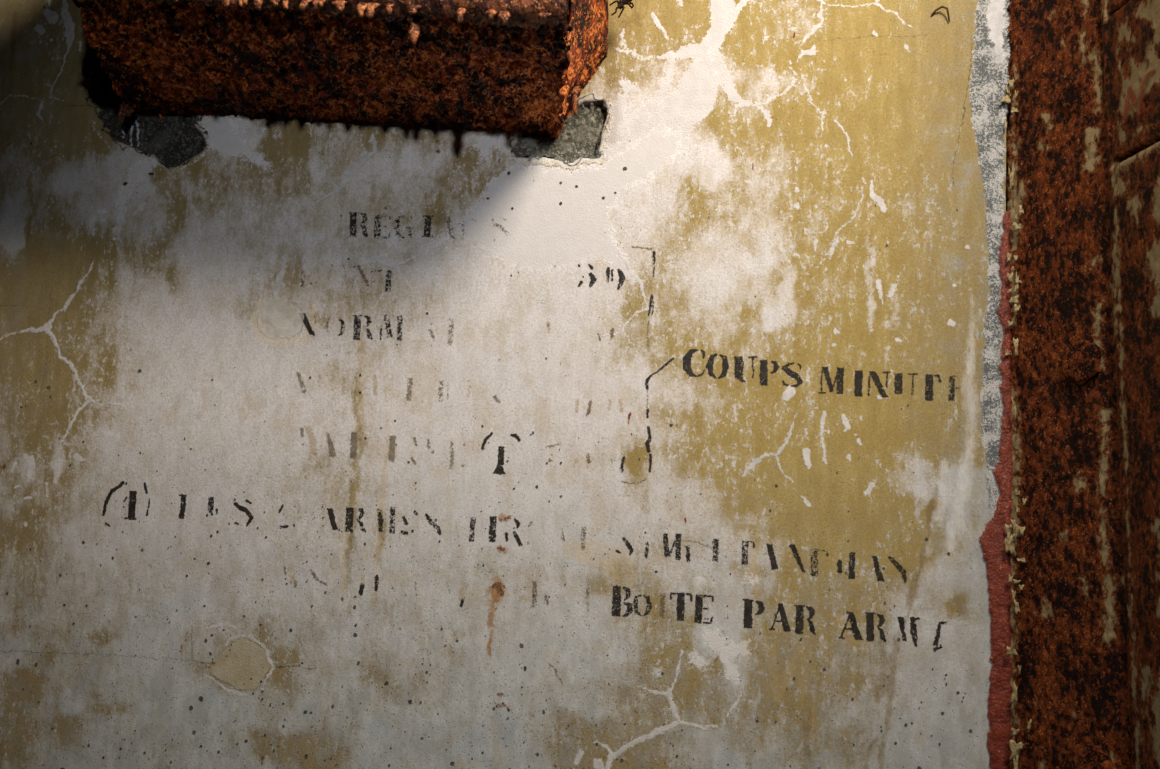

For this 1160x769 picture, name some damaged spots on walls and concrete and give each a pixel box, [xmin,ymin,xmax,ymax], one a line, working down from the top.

rust [208,0,425,44]
rust [456,8,466,23]
rust [485,9,511,25]
crack [651,0,683,40]
spalling [83,62,273,241]
crack [797,0,927,156]
crack [952,42,973,186]
crack [828,186,864,259]
crack [0,260,124,443]
rust [487,576,509,656]
crack [566,650,745,769]